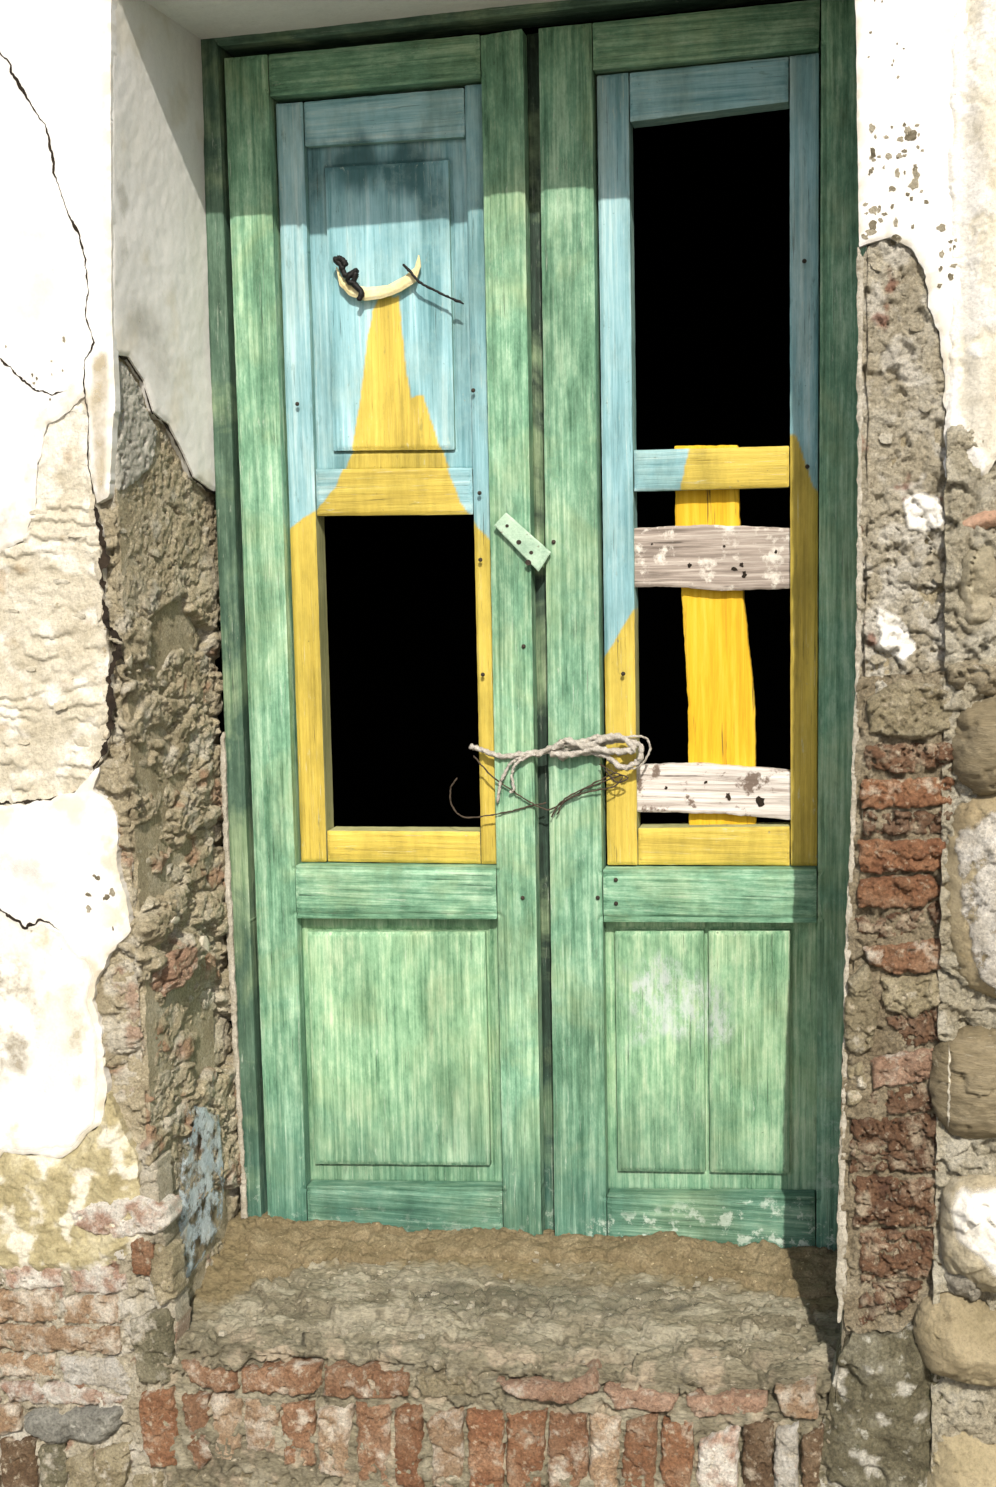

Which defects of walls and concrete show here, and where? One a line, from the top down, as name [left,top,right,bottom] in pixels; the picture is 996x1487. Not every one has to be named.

crack [0,53,216,775]
flaking render [857,0,996,694]
crack [0,909,63,931]
flaking render [0,357,242,1487]